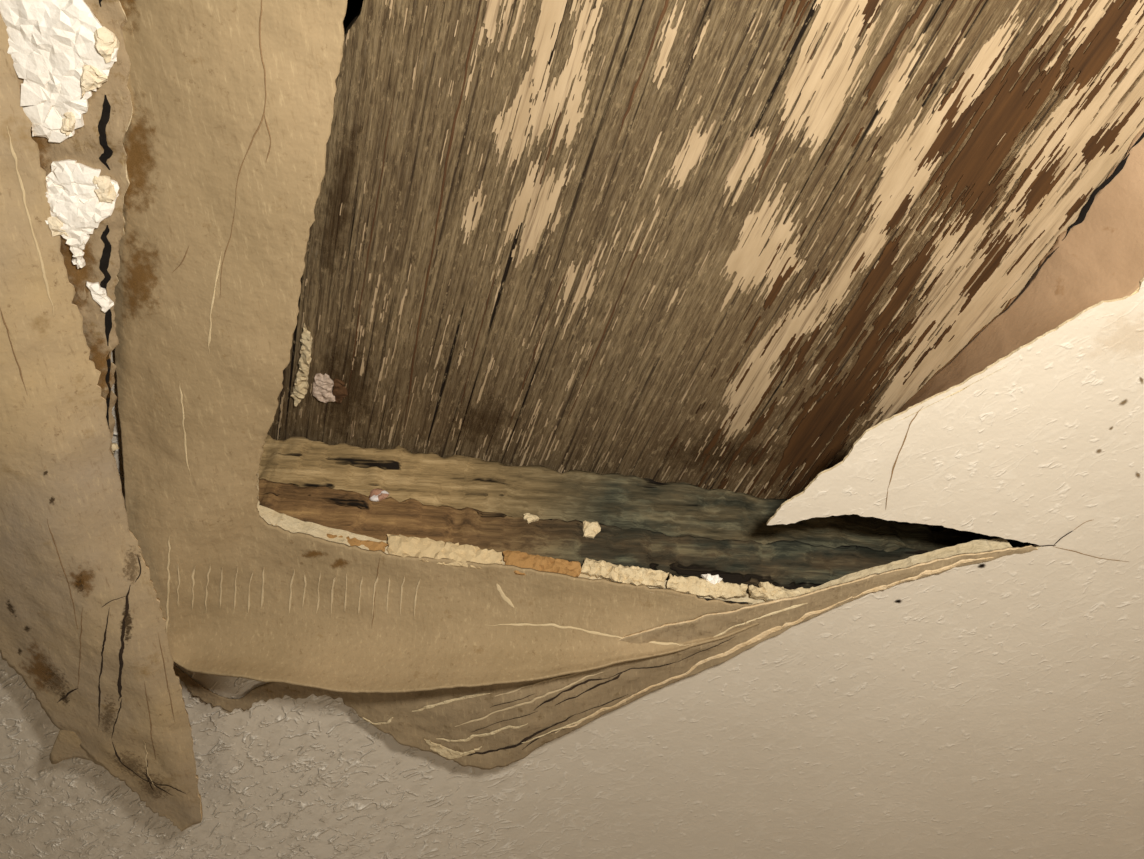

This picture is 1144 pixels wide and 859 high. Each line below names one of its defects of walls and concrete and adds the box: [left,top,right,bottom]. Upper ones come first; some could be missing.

flaking render [0,0,203,832]
crack [98,95,113,170]
crack [99,225,112,429]
leakage [125,122,154,208]
leakage [124,236,157,315]
peeling [277,246,450,453]
flaking render [523,513,539,523]
peeling [438,0,720,473]
flaking render [583,521,601,538]
peeling [661,0,1144,499]
crack [1033,520,1127,562]
flaking render [173,534,1038,770]